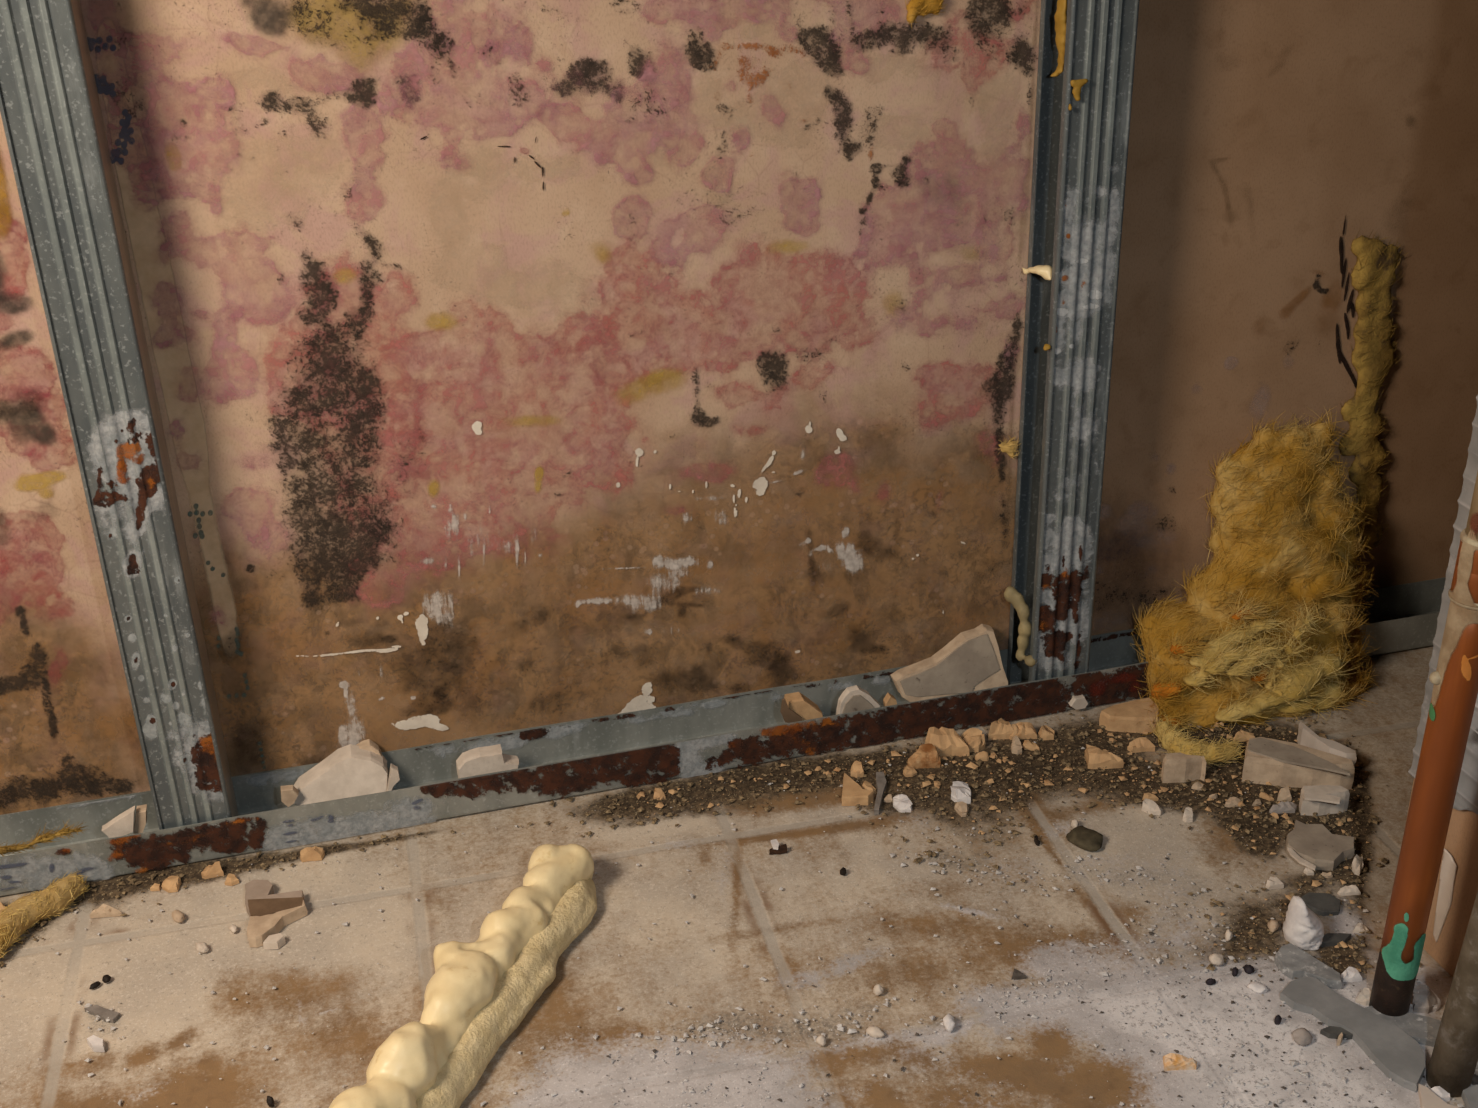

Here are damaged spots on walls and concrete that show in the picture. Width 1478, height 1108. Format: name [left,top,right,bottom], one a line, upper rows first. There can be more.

water stain [0,159,27,250]
water stain [0,276,26,313]
water stain [1,332,52,369]
water stain [0,387,71,497]
corrosion [88,410,164,578]
water stain [90,0,1038,777]
corrosion [1053,187,1120,458]
water stain [0,519,142,815]
corrosion [0,477,1151,890]